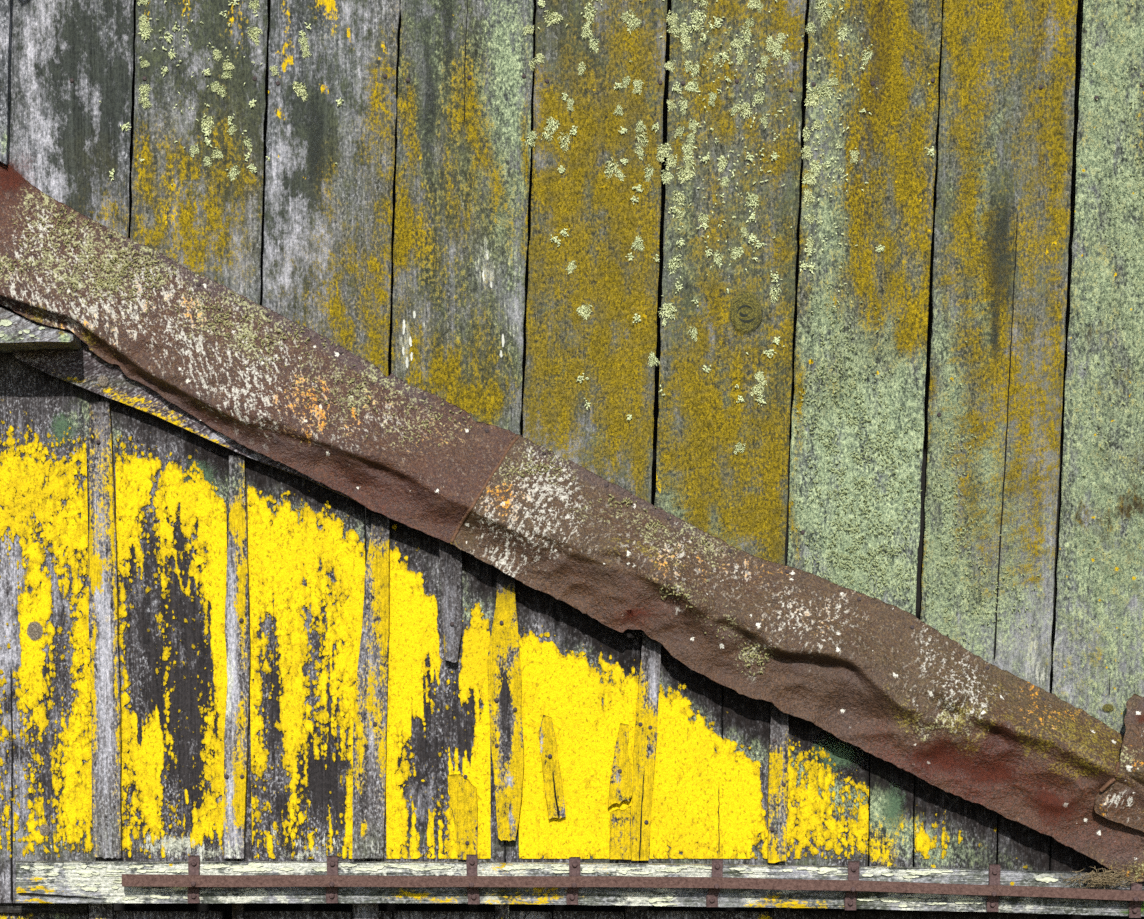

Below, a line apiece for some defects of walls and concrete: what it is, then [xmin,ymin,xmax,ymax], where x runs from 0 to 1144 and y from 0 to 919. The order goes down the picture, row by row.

peeling [202,862,294,872]
peeling [341,863,453,871]
peeling [502,863,595,873]
peeling [616,865,712,874]
peeling [782,867,848,875]
peeling [862,870,953,879]
peeling [648,896,677,906]
peeling [857,897,985,907]